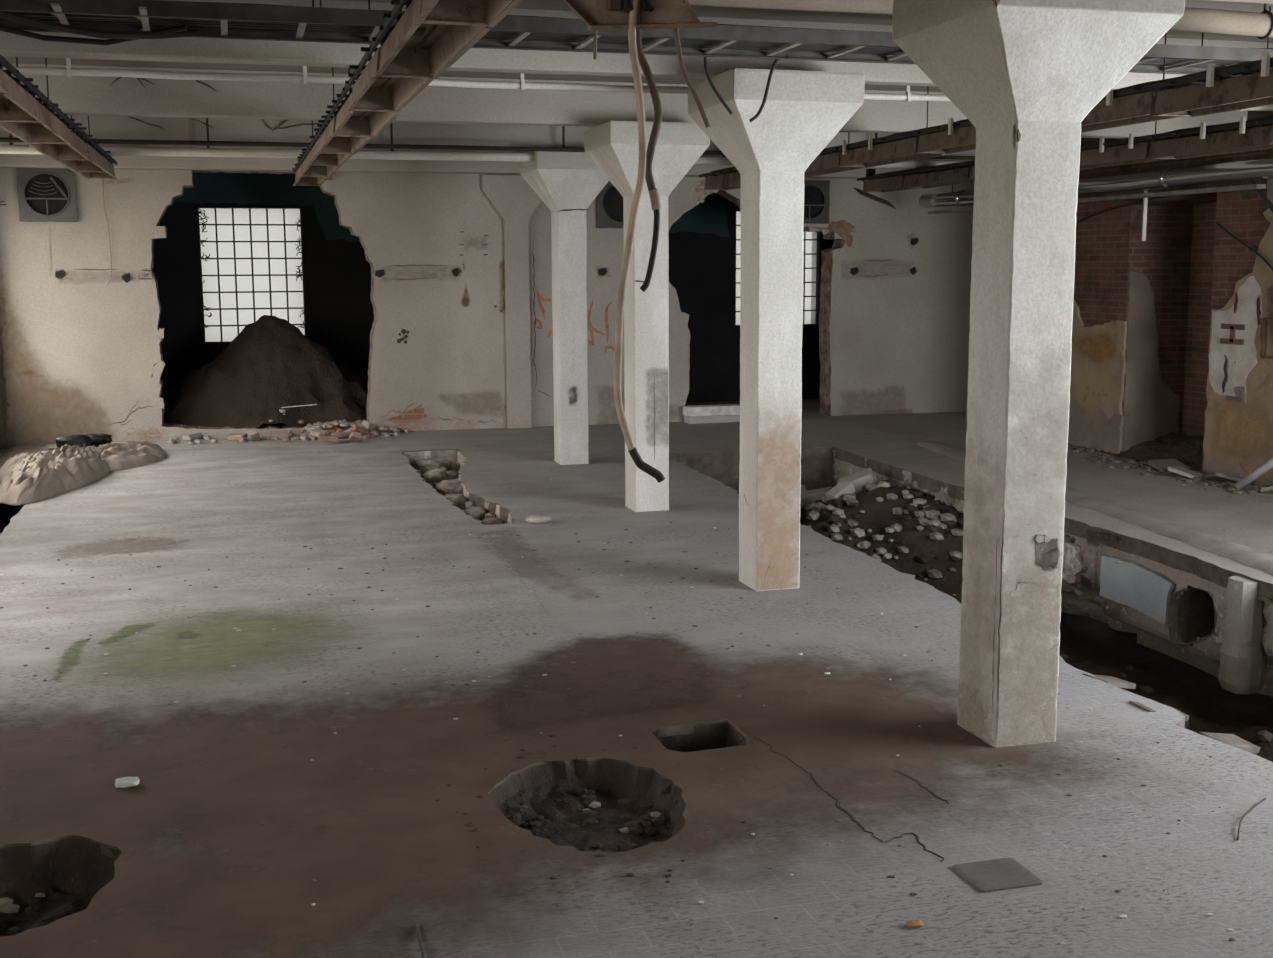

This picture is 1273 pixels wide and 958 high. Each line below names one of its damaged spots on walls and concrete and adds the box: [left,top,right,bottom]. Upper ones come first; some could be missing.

flaking render [1068,399,1124,450]
crack [755,738,949,861]